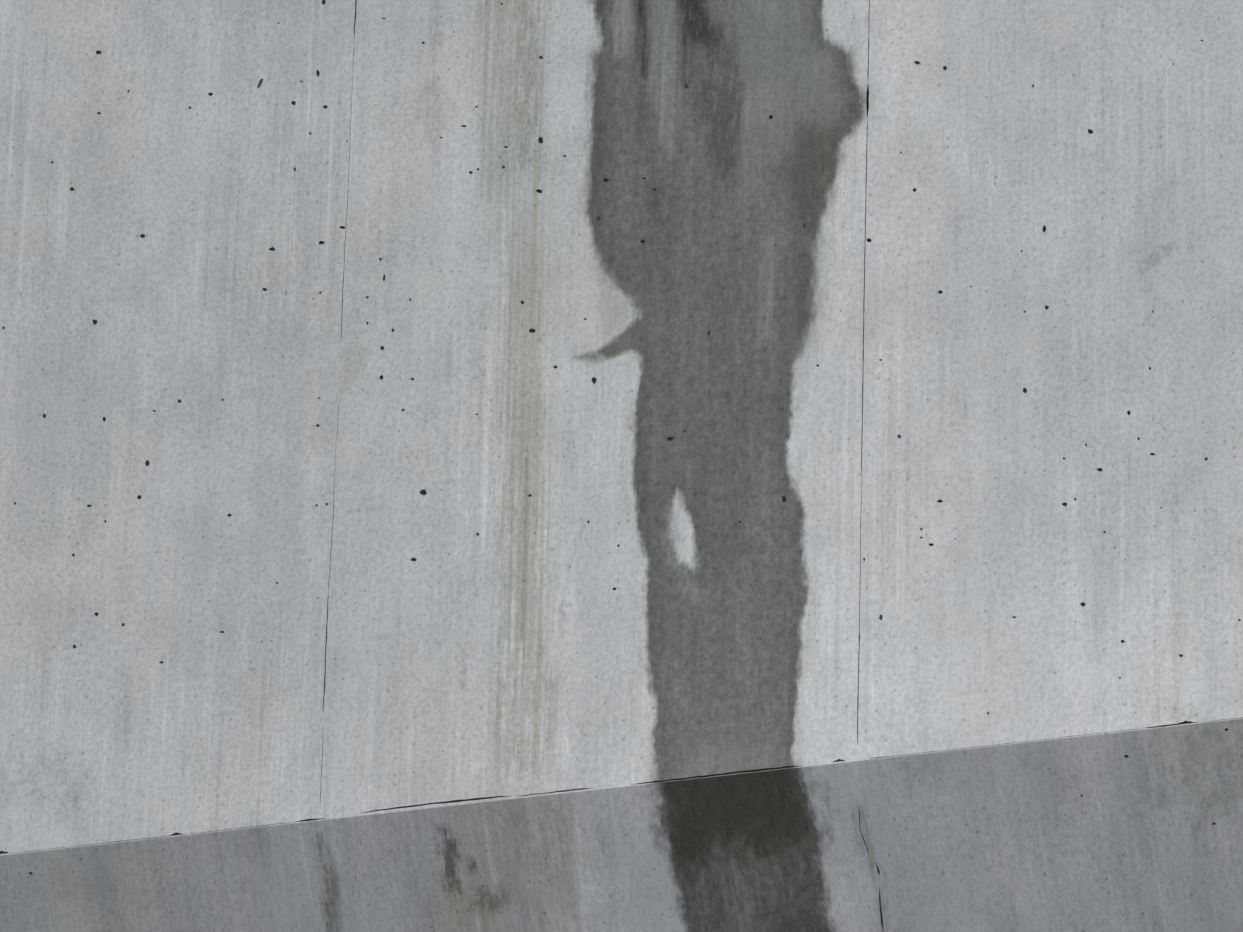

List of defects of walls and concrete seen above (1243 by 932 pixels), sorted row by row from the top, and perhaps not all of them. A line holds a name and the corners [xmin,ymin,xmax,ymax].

leakage [301,0,913,932]